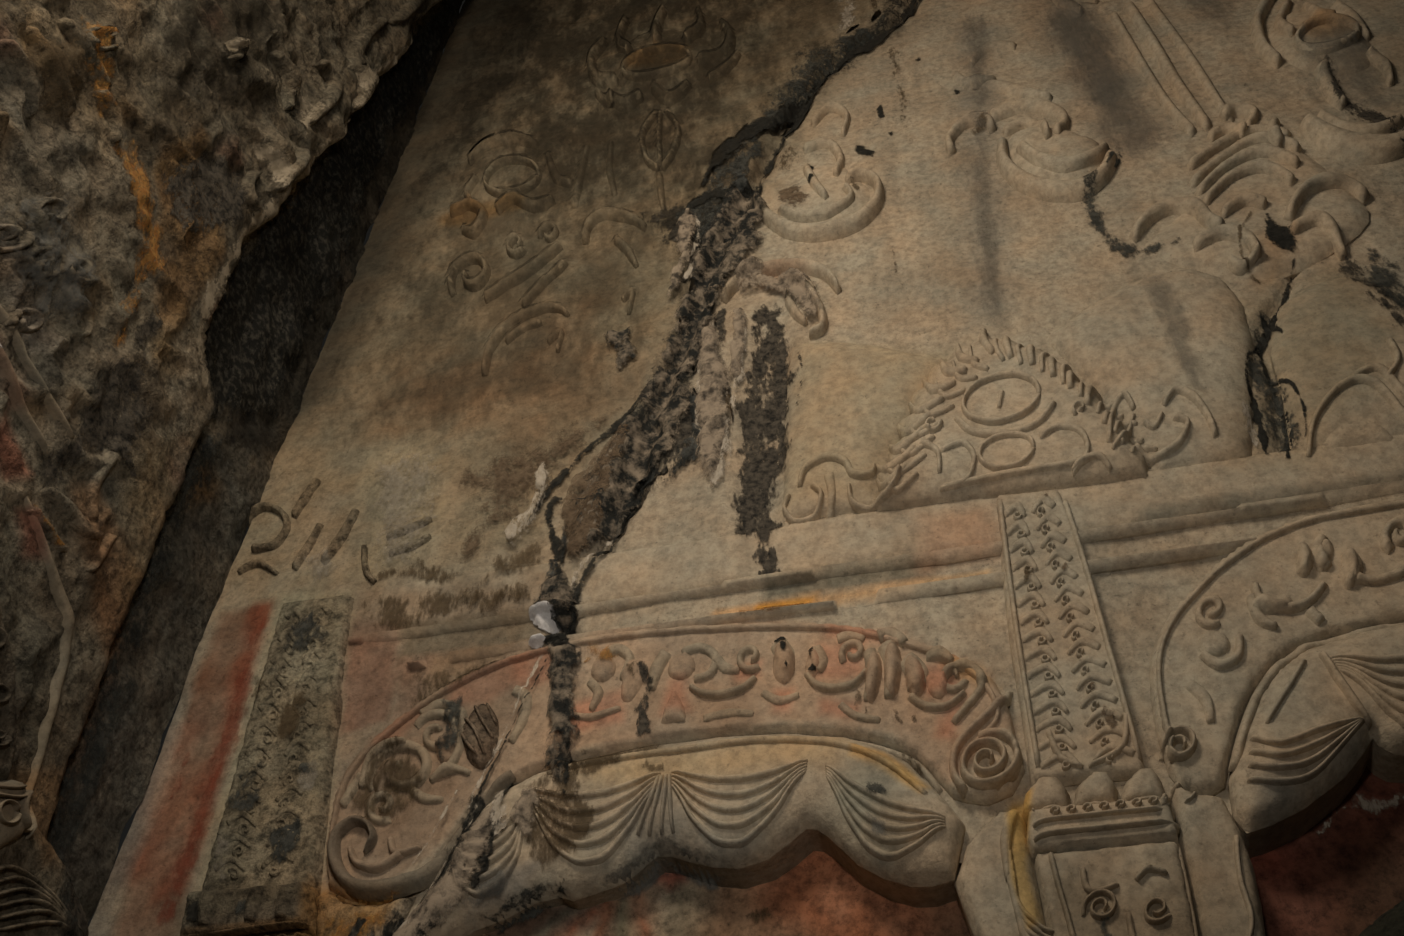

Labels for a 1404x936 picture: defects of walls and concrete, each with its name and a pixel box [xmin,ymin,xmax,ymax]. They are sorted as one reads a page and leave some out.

water stain [364,0,908,709]
crack [689,0,921,208]
flaking render [855,145,875,156]
water stain [1083,151,1180,257]
water stain [1339,248,1404,325]
flaking render [456,165,819,782]
crack [458,378,674,840]